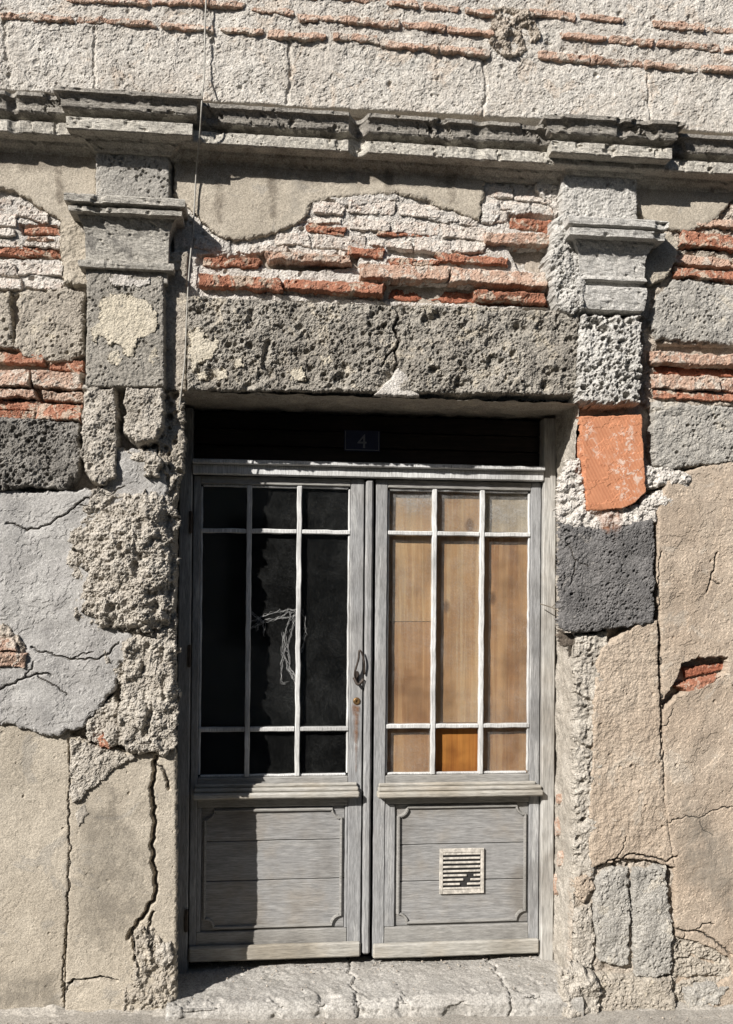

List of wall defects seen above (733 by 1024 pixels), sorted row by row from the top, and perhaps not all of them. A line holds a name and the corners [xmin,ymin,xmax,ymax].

flaking render [0,191,70,297]
flaking render [173,181,557,311]
crack [382,310,401,371]
flaking render [568,201,733,413]
crack [9,476,123,531]
flaking render [0,623,28,669]
crack [0,644,117,693]
flaking render [69,633,180,826]
crack [653,553,673,752]
crack [62,746,169,1001]
flaking render [553,629,732,1011]
crack [673,922,730,954]